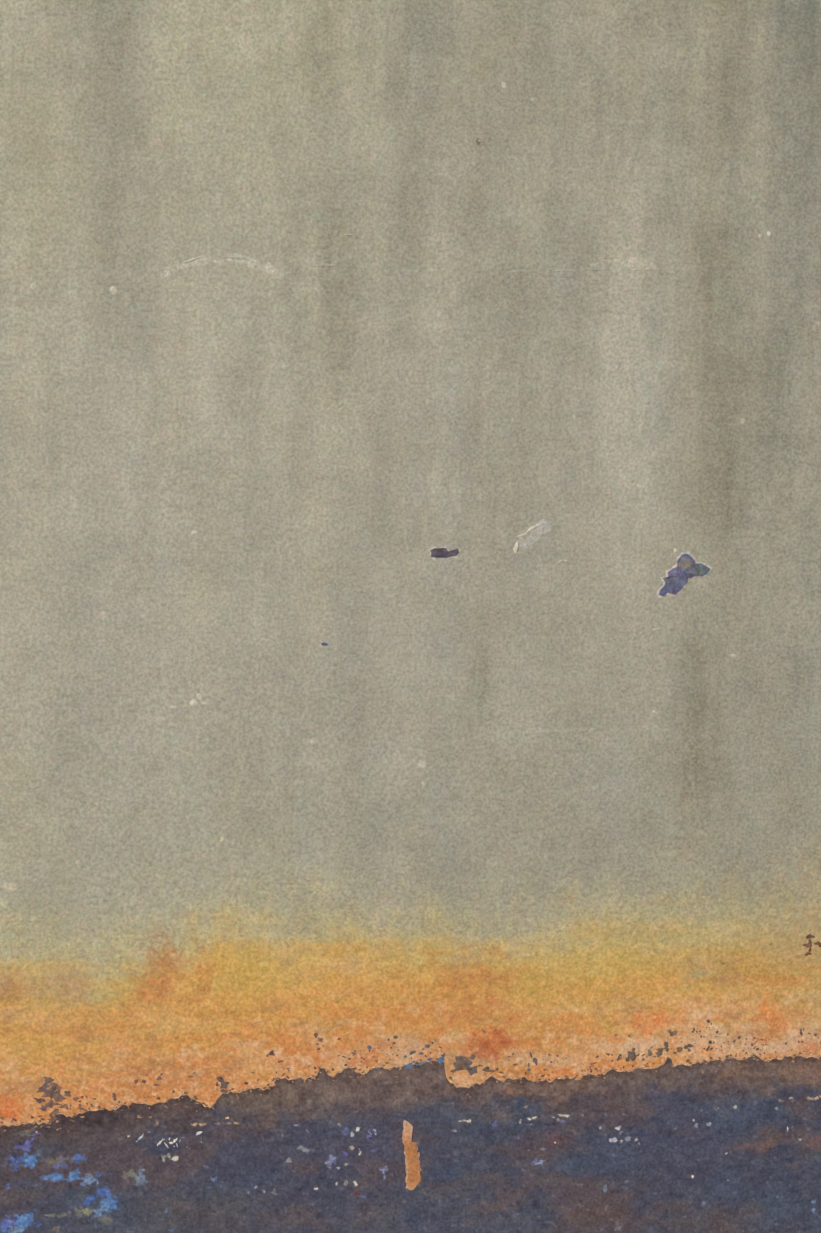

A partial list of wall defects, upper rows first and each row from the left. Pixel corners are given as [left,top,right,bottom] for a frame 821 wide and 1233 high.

peeling [656,548,712,599]
corrosion [0,898,821,1125]